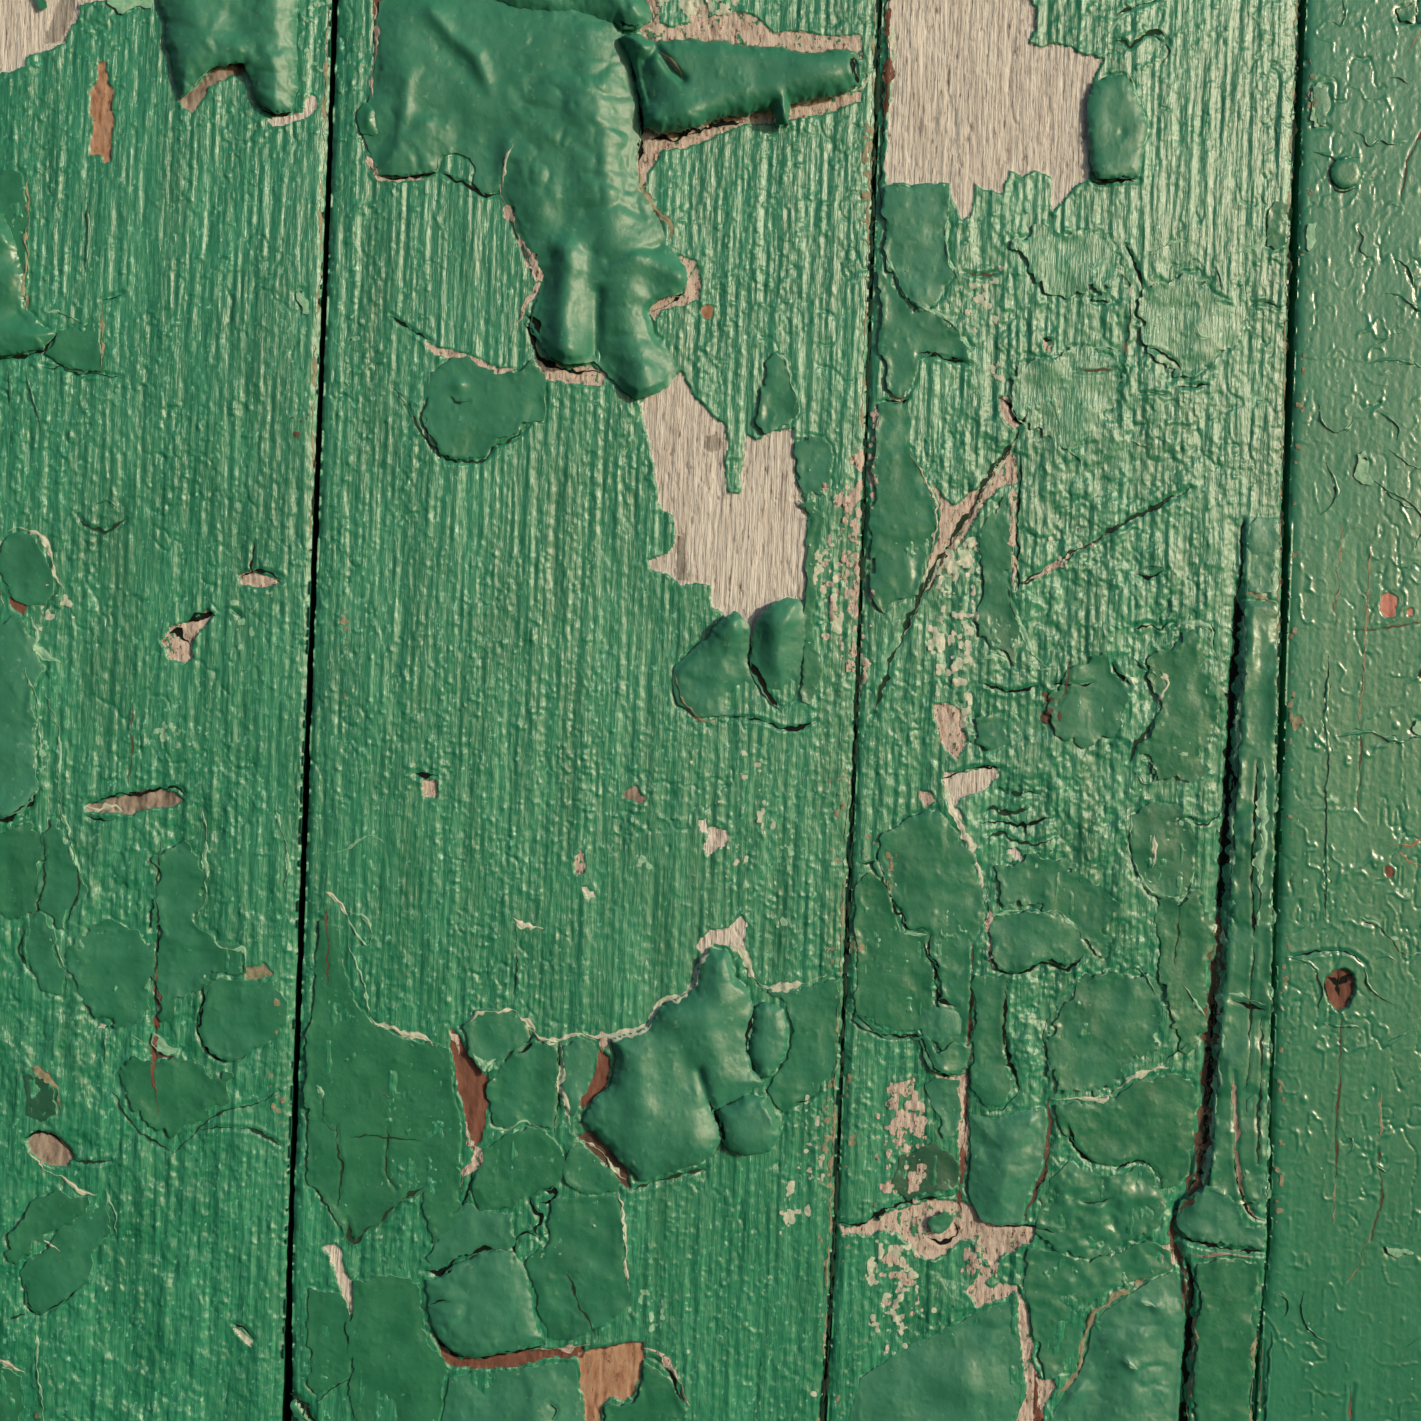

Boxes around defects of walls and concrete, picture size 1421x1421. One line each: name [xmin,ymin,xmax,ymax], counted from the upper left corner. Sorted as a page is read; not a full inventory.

peeling [0,0,154,73]
peeling [869,0,1149,666]
crack [1125,246,1144,289]
crack [1077,348,1207,396]
crack [170,611,242,644]
peeling [640,351,834,704]
peeling [1241,517,1279,594]
crack [87,708,185,822]
crack [837,519,1265,1421]
peeling [761,703,1272,1421]
peeling [303,920,646,1421]
crack [428,1186,558,1359]